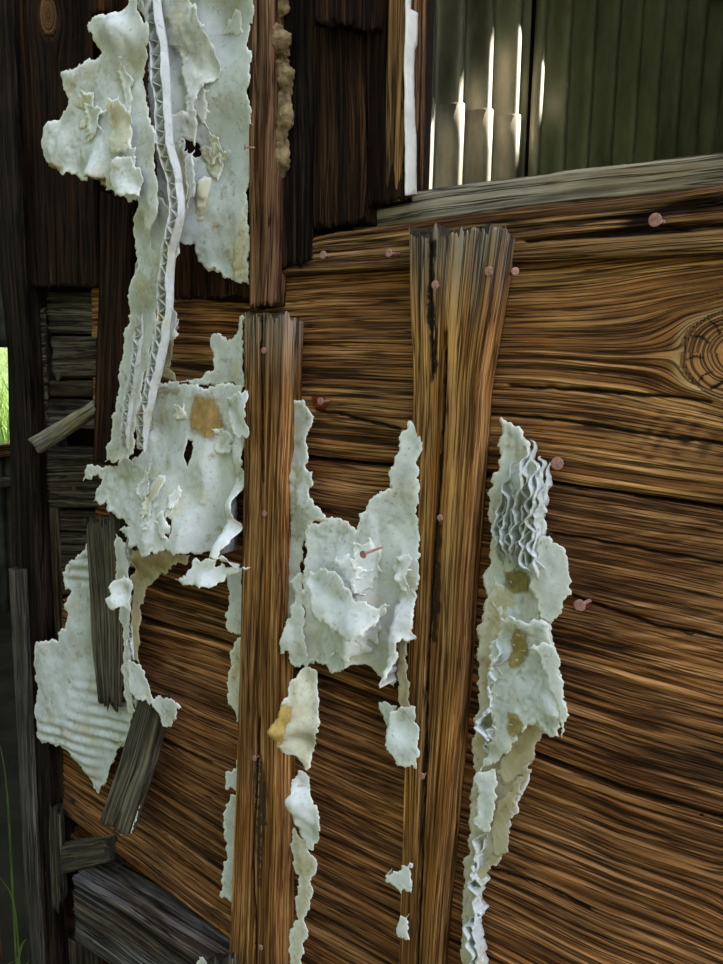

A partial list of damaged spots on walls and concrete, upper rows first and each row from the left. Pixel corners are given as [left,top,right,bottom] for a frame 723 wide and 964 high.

peeling [404,0,418,196]
crack [512,321,723,403]
crack [491,413,723,444]